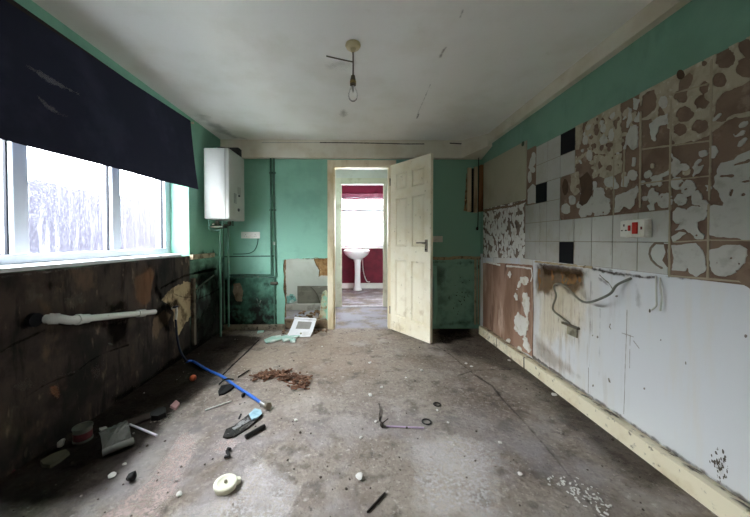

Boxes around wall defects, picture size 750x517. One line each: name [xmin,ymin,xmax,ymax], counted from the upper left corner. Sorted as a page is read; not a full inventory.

damp [0,267,260,505]
spalling [152,281,191,340]
peeling [483,146,536,357]
damp [535,261,655,294]
peeling [560,36,750,285]
damp [736,269,750,289]